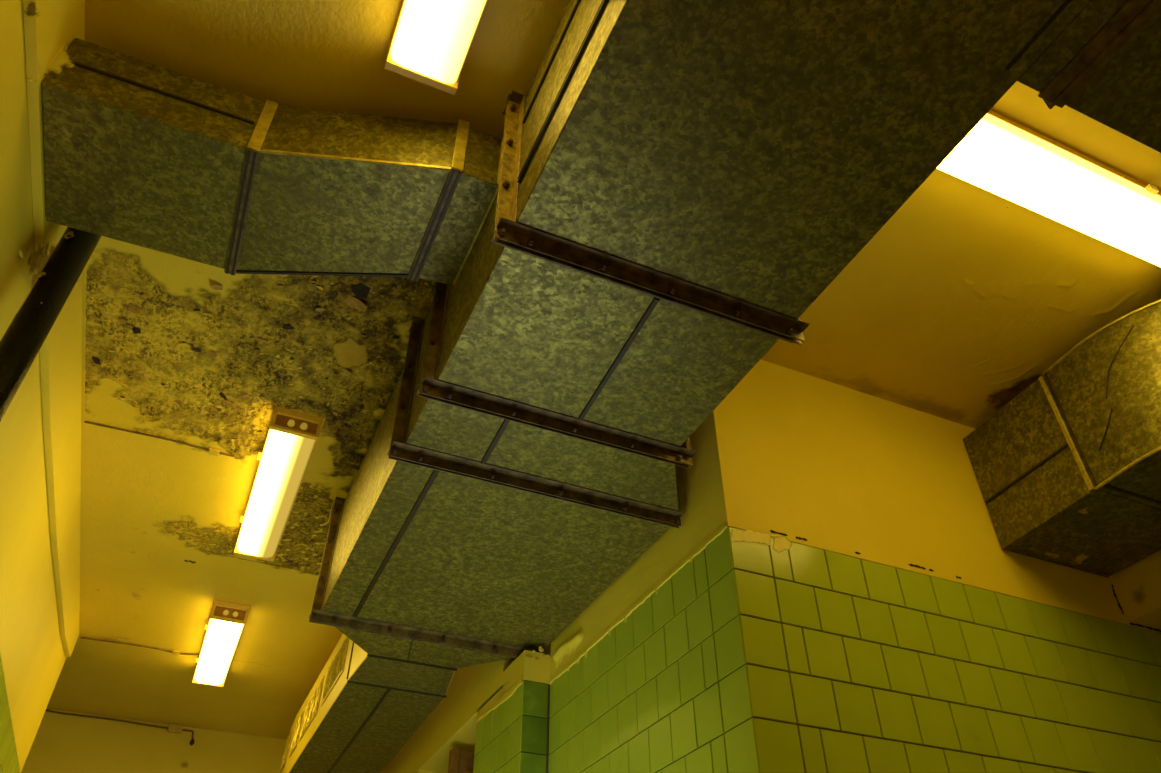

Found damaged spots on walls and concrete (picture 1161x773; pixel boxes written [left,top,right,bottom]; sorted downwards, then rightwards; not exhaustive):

flaking render [18,244,55,312]
peeling [85,251,436,575]
damp [989,375,1044,410]